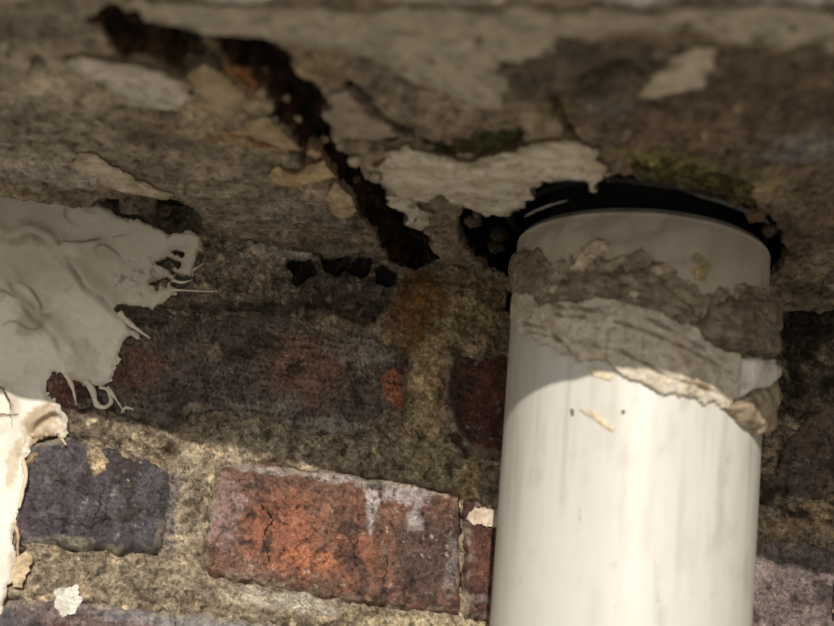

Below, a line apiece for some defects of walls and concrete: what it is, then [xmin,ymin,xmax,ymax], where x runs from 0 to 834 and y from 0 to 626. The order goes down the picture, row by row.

peeling [63,51,194,110]
crack [89,3,440,270]
peeling [245,81,358,221]
peeling [122,0,834,110]
peeling [373,125,611,231]
peeling [0,150,217,617]